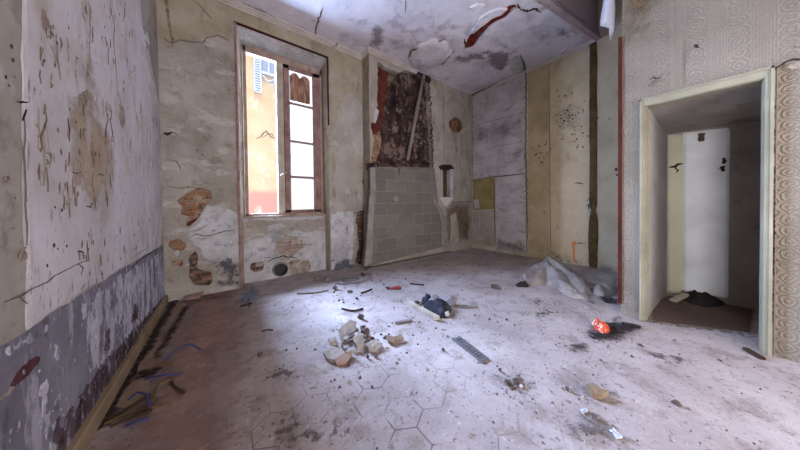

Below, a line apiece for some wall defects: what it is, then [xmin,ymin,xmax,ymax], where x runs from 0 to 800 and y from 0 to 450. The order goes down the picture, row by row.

crack [142,3,230,72]
leakage [72,103,109,200]
peeling [156,0,364,265]
peeling [5,0,215,376]
crack [3,251,88,304]
crack [114,248,156,279]
flaking render [250,261,264,272]
flaking render [268,223,311,275]